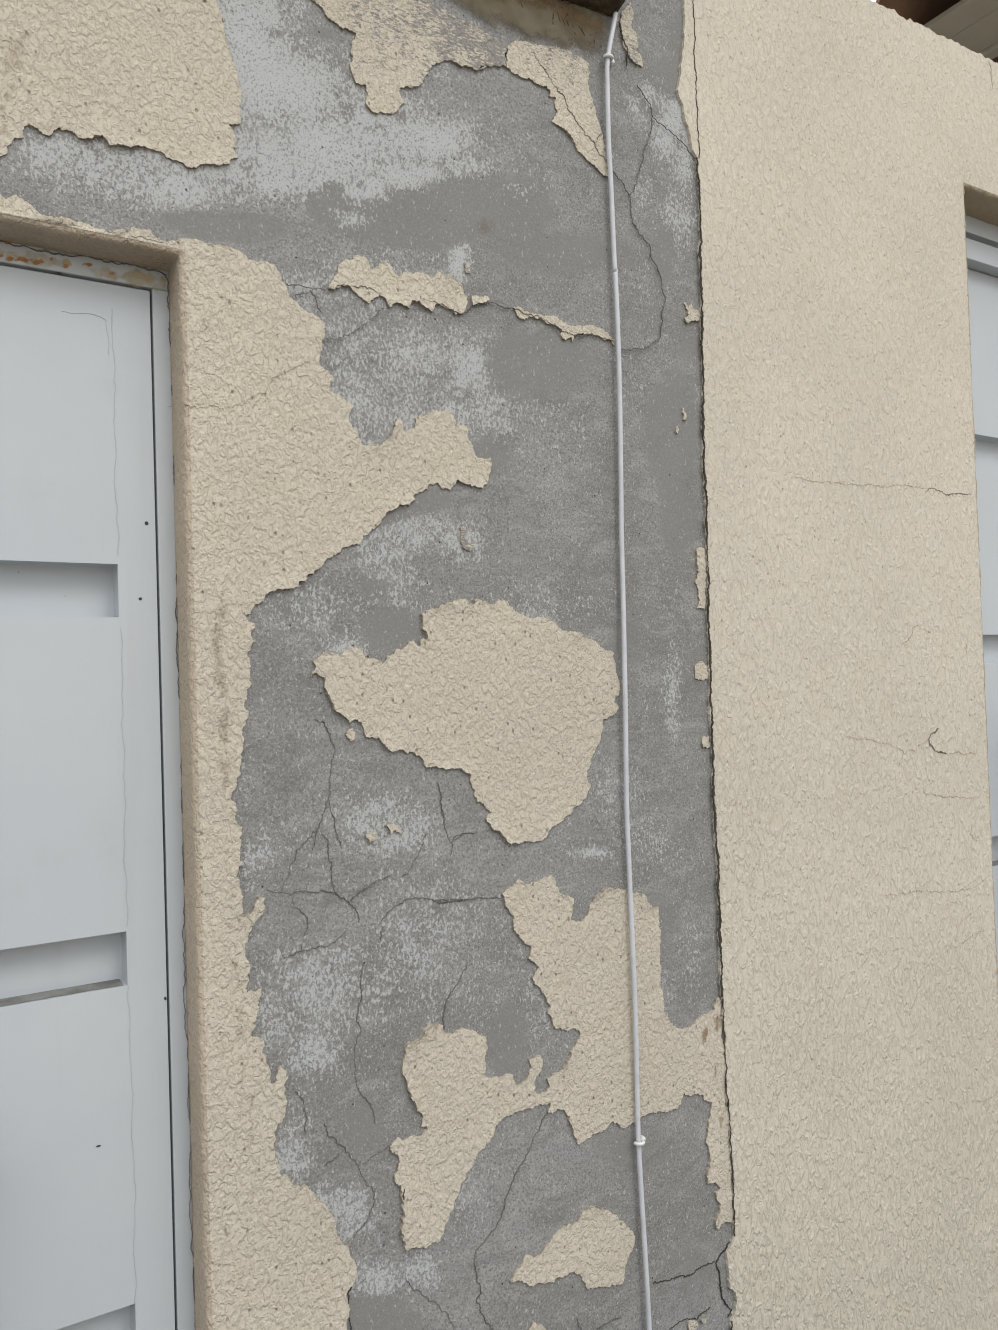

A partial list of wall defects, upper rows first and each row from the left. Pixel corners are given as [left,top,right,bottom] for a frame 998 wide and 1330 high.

corrosion [0,241,92,268]
crack [169,284,385,409]
peeling [0,0,735,1330]
crack [407,0,735,1330]
crack [267,719,499,1238]